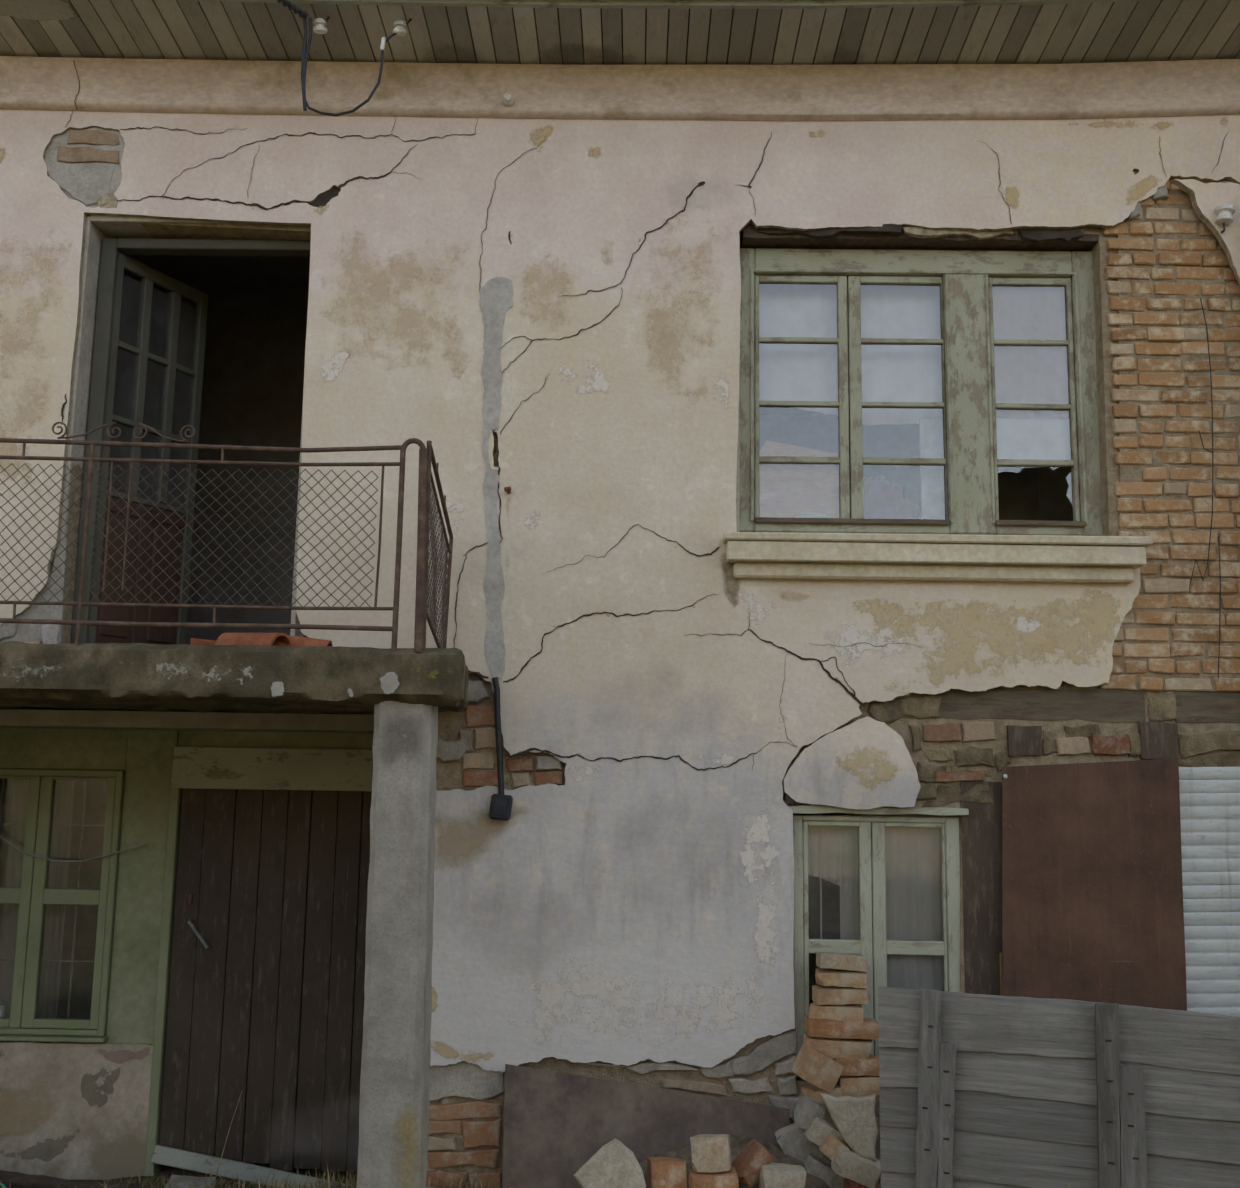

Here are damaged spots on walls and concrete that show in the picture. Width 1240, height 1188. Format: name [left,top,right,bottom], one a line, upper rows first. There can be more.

flaking render [45,127,125,208]
crack [101,116,478,210]
crack [479,135,547,292]
crack [742,132,772,214]
crack [977,141,1012,224]
crack [483,185,701,373]
flaking render [825,171,1240,692]
crack [453,467,922,771]
flaking render [462,705,564,788]
peeling [739,809,784,967]
peeling [431,1042,493,1061]